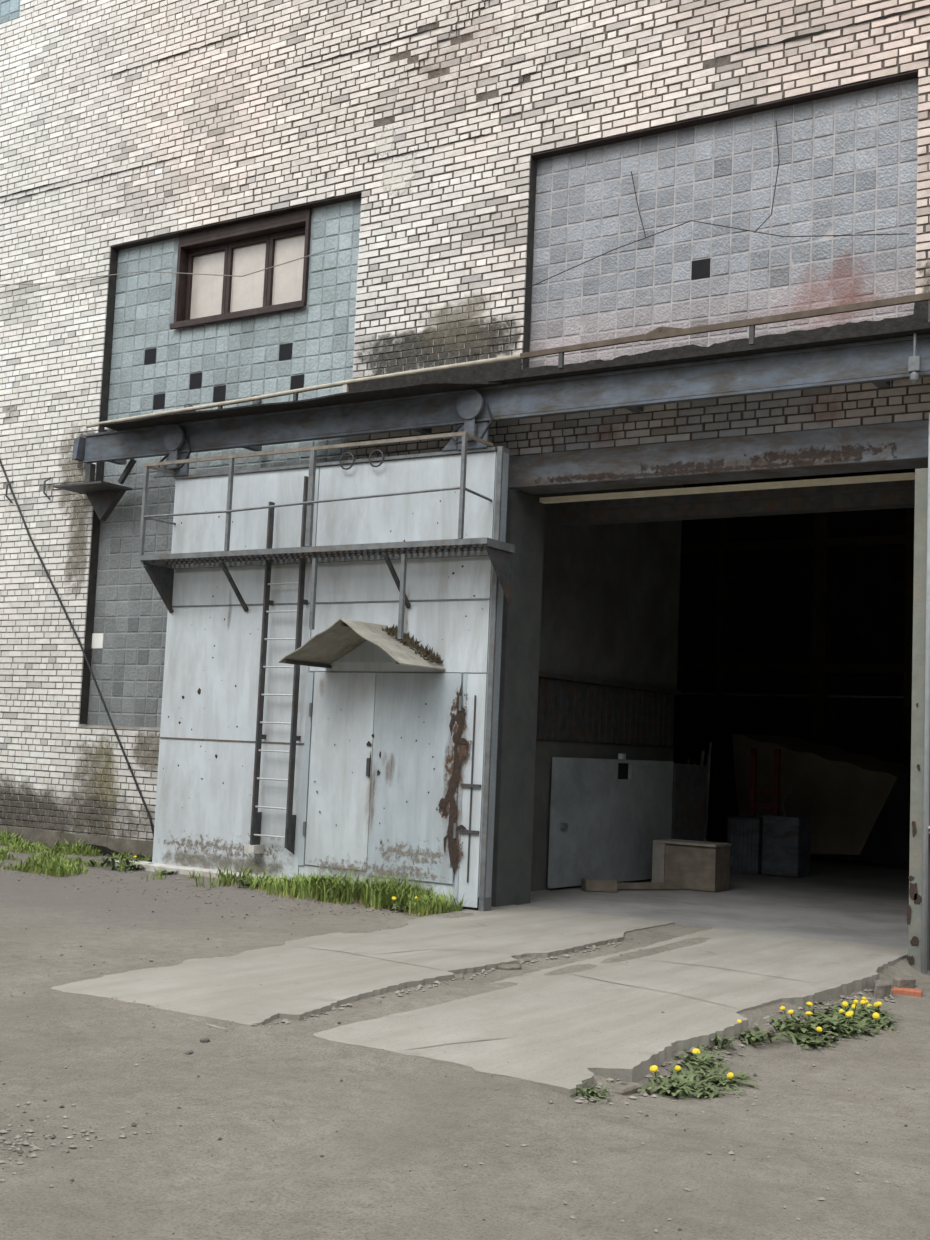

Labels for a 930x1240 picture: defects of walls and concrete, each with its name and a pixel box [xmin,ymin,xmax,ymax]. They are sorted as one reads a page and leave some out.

water stain [358,296,522,376]
water stain [73,743,116,835]
water stain [134,733,160,769]
corrosion [436,683,472,875]